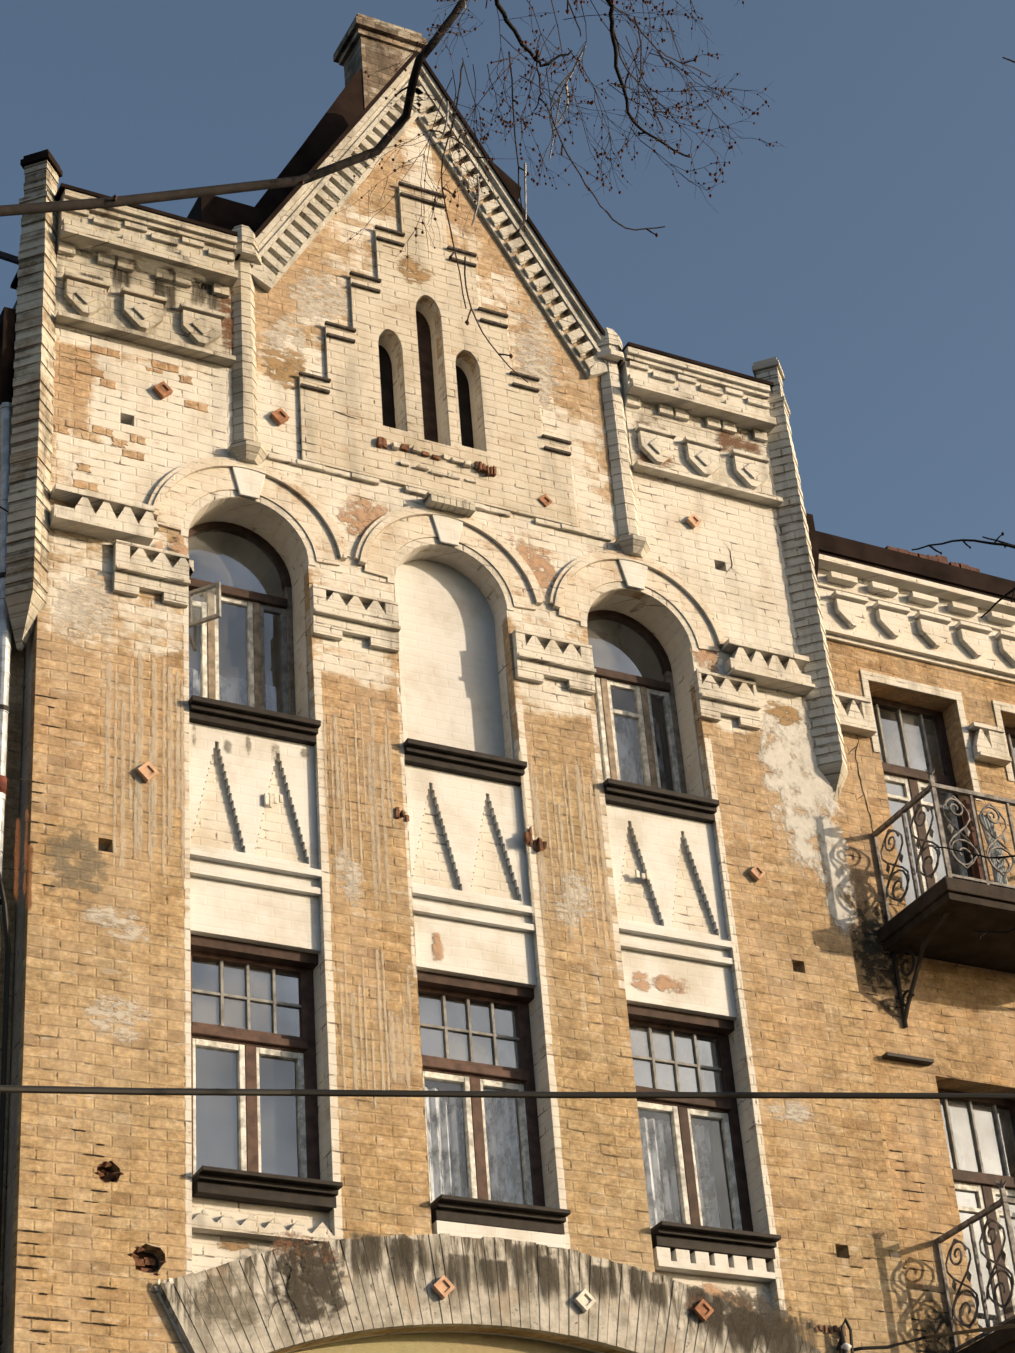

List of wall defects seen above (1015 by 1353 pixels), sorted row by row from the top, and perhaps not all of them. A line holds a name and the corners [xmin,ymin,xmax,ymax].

peeling [53,344,120,390]
peeling [146,359,208,413]
peeling [262,344,306,390]
peeling [54,419,146,461]
peeling [631,971,688,993]
hole [95,1161,124,1183]
spalling [127,1246,175,1287]
leakage [194,1270,257,1331]
leakage [272,1233,430,1332]
leakage [448,1244,560,1299]
leakage [592,1265,668,1308]
leakage [687,1287,817,1353]